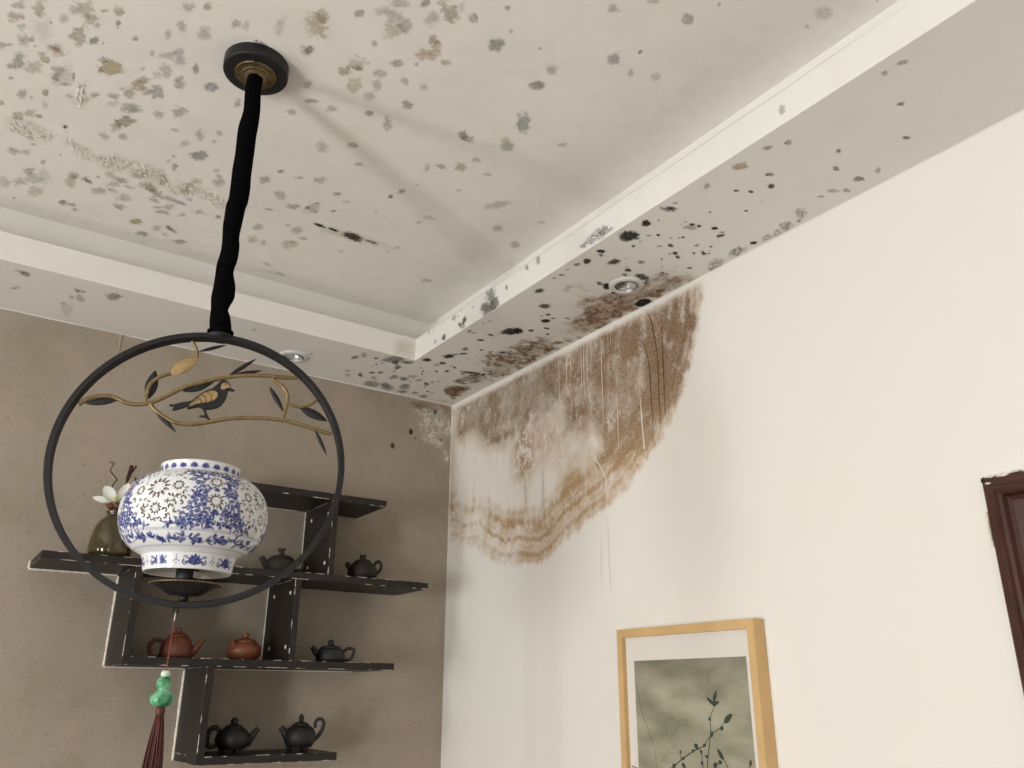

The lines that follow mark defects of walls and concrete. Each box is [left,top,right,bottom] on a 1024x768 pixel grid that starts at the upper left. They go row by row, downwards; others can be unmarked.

water stain [359,207,804,570]